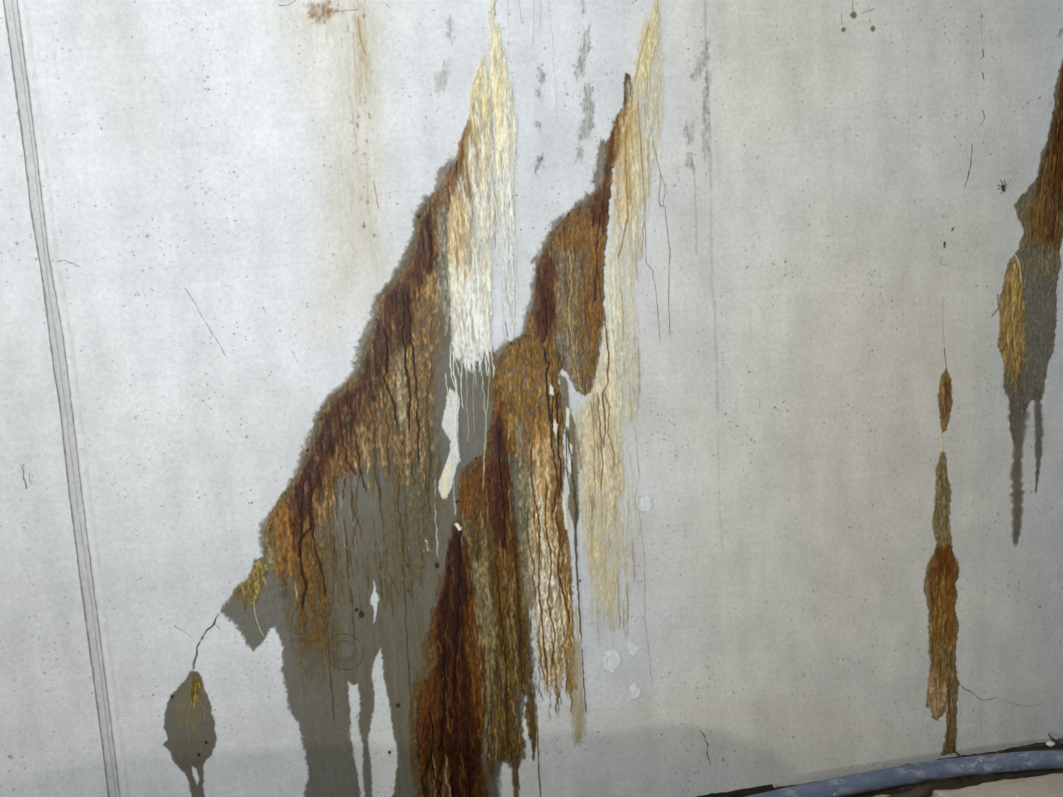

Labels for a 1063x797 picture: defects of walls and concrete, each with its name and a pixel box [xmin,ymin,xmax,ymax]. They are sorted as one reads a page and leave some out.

corrosion [309,1,339,23]
damp [164,671,216,797]
crack [193,618,216,669]
corrosion [234,98,479,662]
corrosion [410,73,633,797]
corrosion [924,348,960,756]
corrosion [991,60,1063,544]